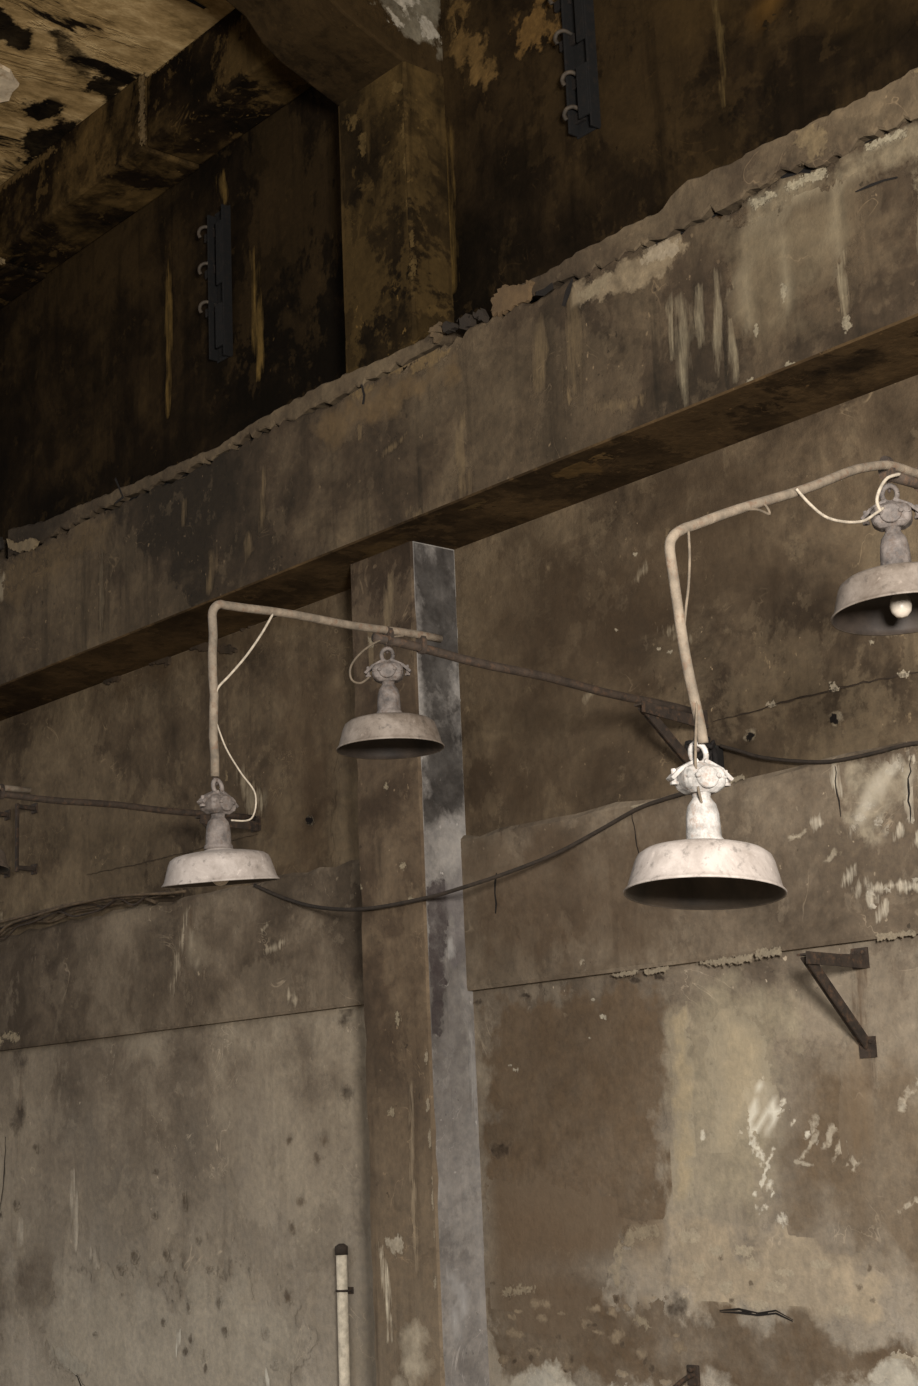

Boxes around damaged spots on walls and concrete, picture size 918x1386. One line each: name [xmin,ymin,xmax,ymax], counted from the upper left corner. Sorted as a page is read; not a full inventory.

peeling [0,64,19,102]
peeling [369,0,501,108]
peeling [508,0,562,61]
crack [753,167,814,195]
crack [855,177,898,193]
water stain [164,239,173,419]
water stain [249,245,267,383]
crack [535,279,573,306]
water stain [665,173,864,409]
crack [98,432,266,514]
water stain [764,1027,918,1319]
peeling [483,1158,918,1386]